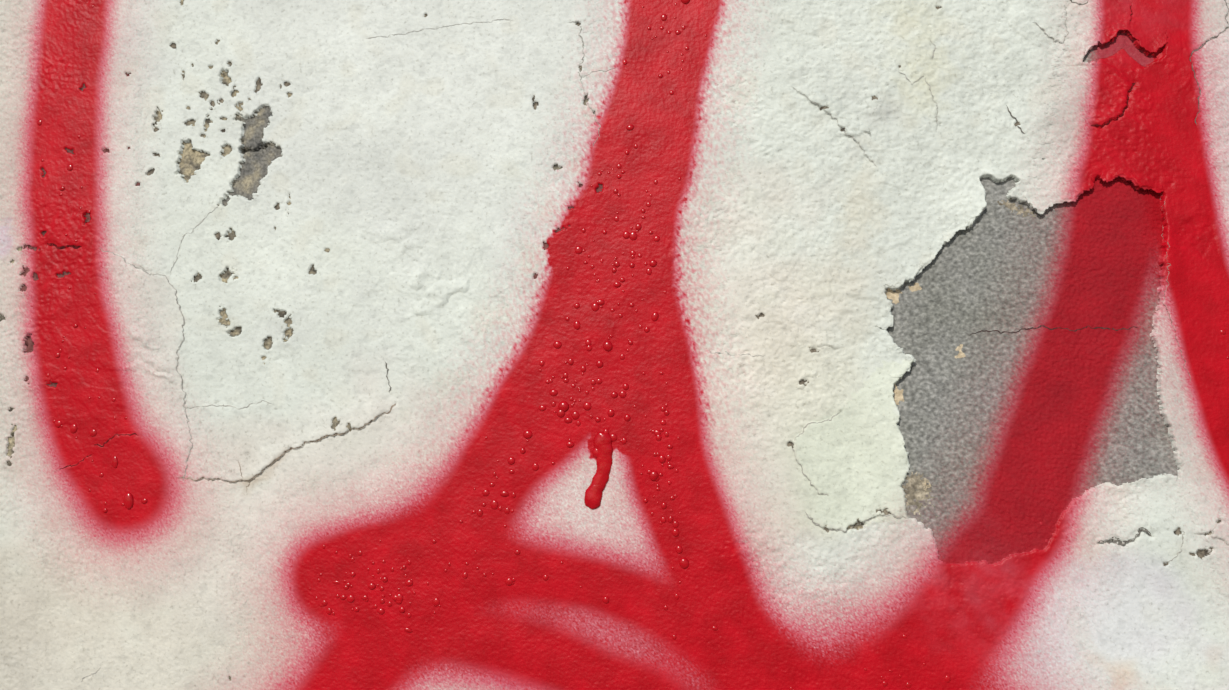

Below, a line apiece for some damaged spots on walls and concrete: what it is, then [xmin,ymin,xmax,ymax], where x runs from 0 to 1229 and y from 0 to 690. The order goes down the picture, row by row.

crack [1091,82,1136,126]
flaking render [178,62,282,206]
flaking render [10,231,46,292]
flaking render [219,268,238,283]
flaking render [24,334,35,353]
crack [32,205,396,493]
flaking render [219,306,242,337]
flaking render [261,310,293,364]
peeling [875,171,1164,535]
peeling [1090,360,1179,495]
flaking render [1189,520,1221,559]